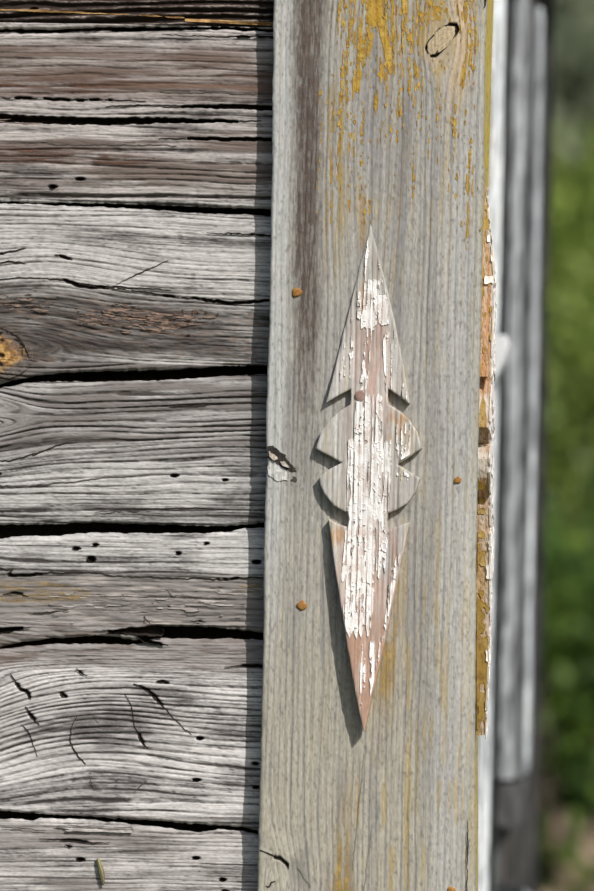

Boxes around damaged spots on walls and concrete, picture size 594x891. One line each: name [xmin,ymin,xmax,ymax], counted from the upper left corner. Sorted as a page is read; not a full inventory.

peeling [317,0,479,250]
crack [0,248,270,305]
spalling [267,446,297,482]
peeling [340,237,410,705]
peeling [480,187,497,738]
crack [10,674,40,757]
crack [69,713,97,790]
crack [125,680,192,749]